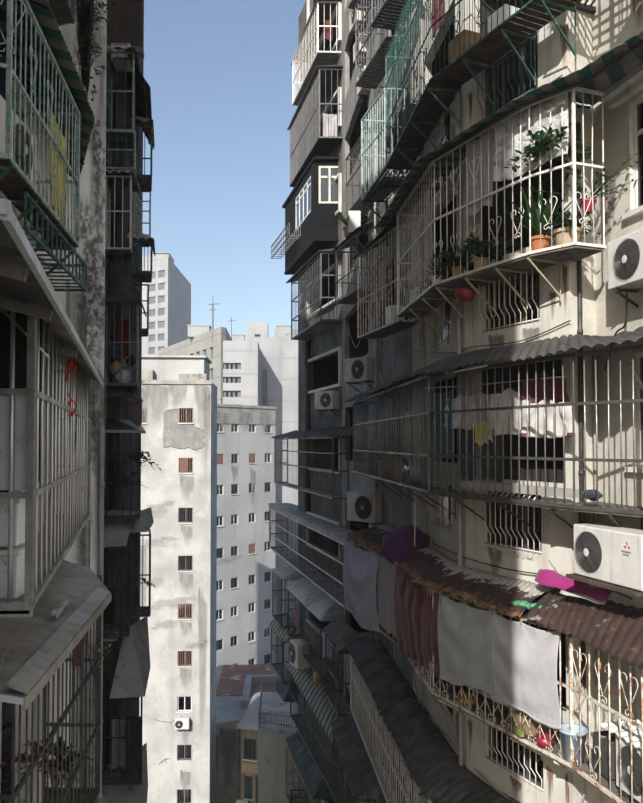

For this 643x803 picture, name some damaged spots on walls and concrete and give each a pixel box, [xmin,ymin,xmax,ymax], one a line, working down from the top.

peeling [163,409,205,451]